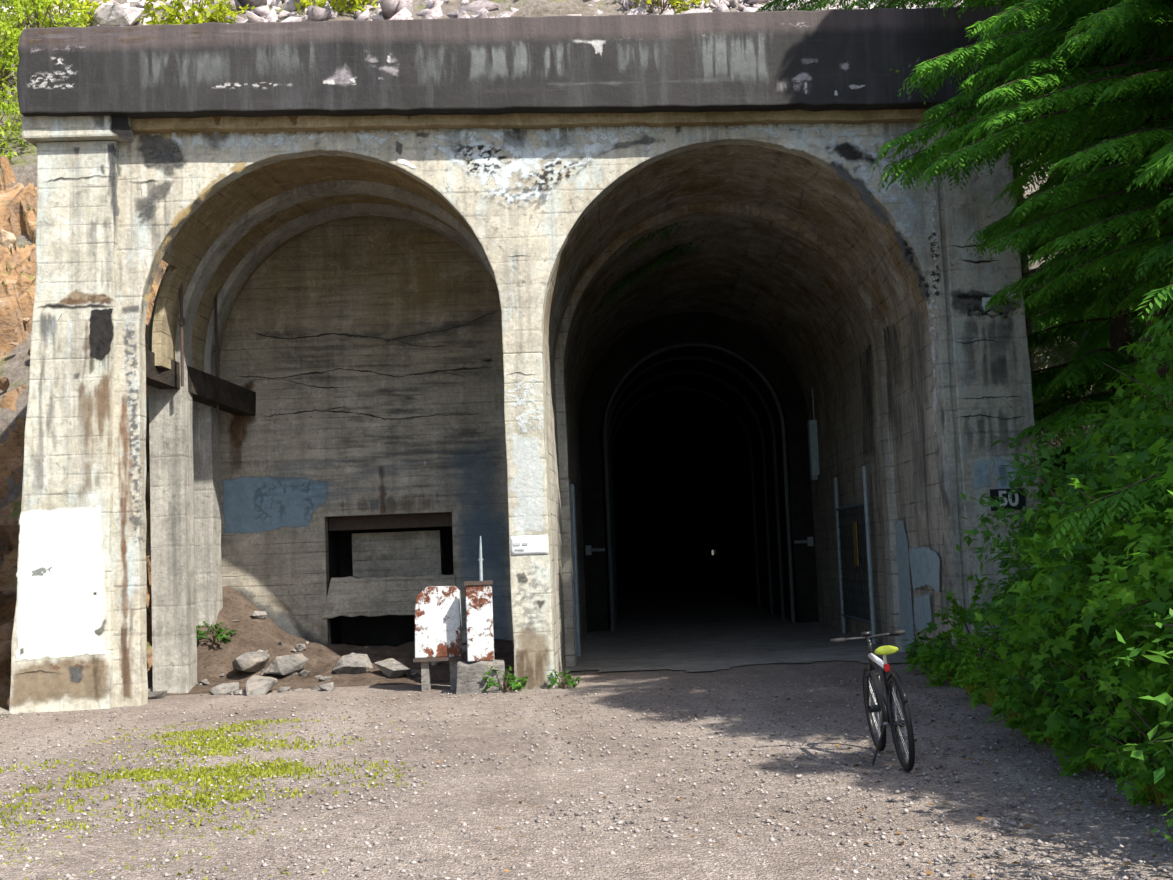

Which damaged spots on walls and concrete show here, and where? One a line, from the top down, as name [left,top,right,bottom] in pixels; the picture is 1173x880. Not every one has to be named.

water stain [166,132,251,147]
water stain [200,161,244,196]
spalling [353,131,416,168]
peeling [417,127,641,203]
water stain [153,207,189,274]
crack [239,312,538,420]
rust [80,376,133,676]